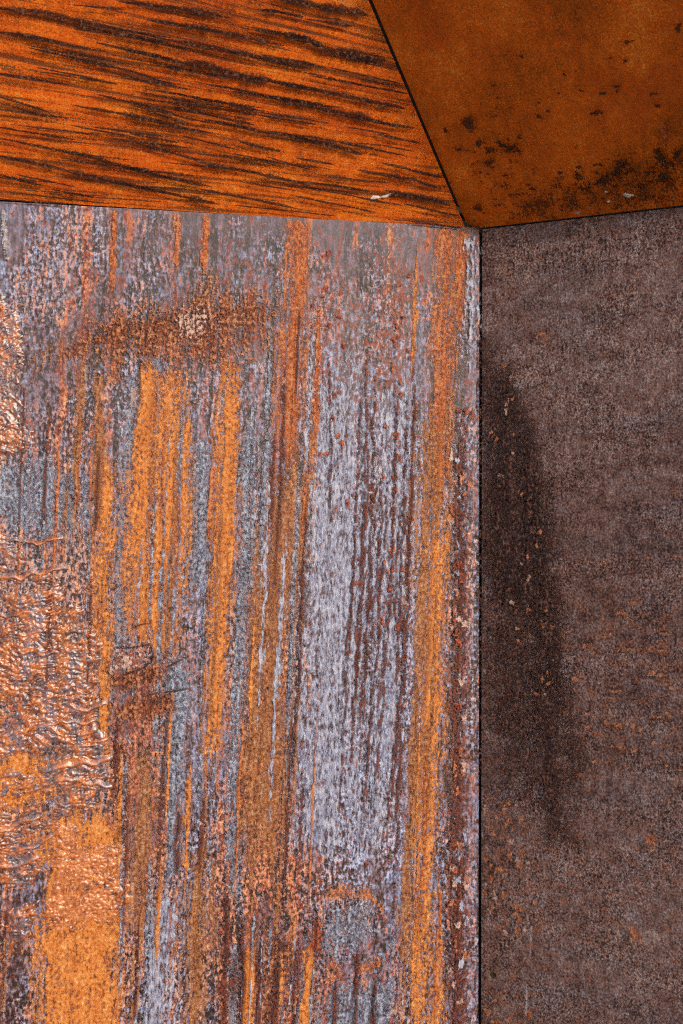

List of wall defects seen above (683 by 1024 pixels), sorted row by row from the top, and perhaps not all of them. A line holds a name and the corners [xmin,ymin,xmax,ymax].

corrosion [0,213,384,1024]
corrosion [380,227,538,1024]
water stain [474,327,593,856]